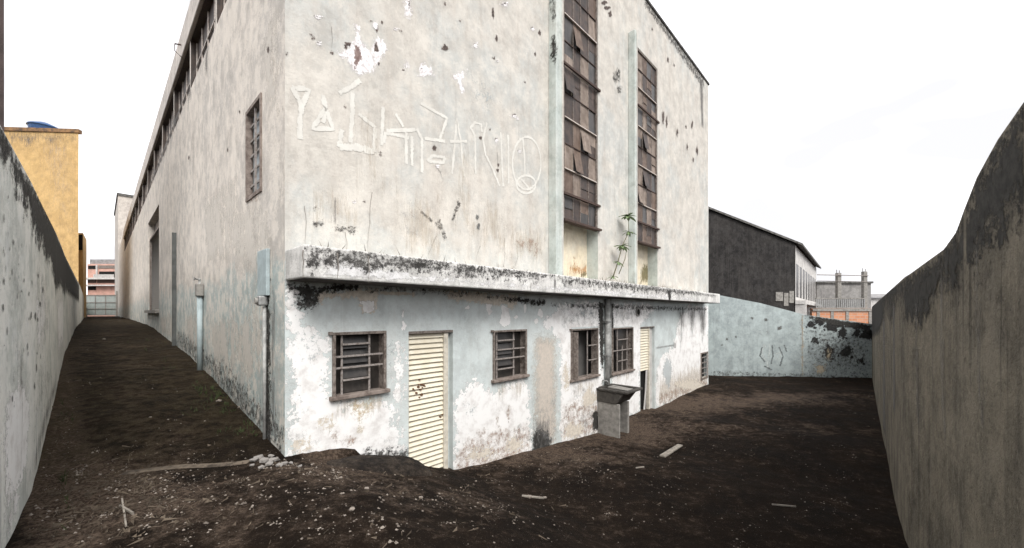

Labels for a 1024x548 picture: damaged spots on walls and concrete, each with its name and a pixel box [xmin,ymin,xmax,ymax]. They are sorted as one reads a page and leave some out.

flaking render [309,0,413,76]
leakage [0,126,79,301]
leakage [177,296,284,452]
peeling [285,281,409,457]
peeling [453,377,535,470]
leakage [287,245,716,368]
peeling [317,261,709,442]
leakage [531,421,552,450]
leakage [701,109,1023,437]